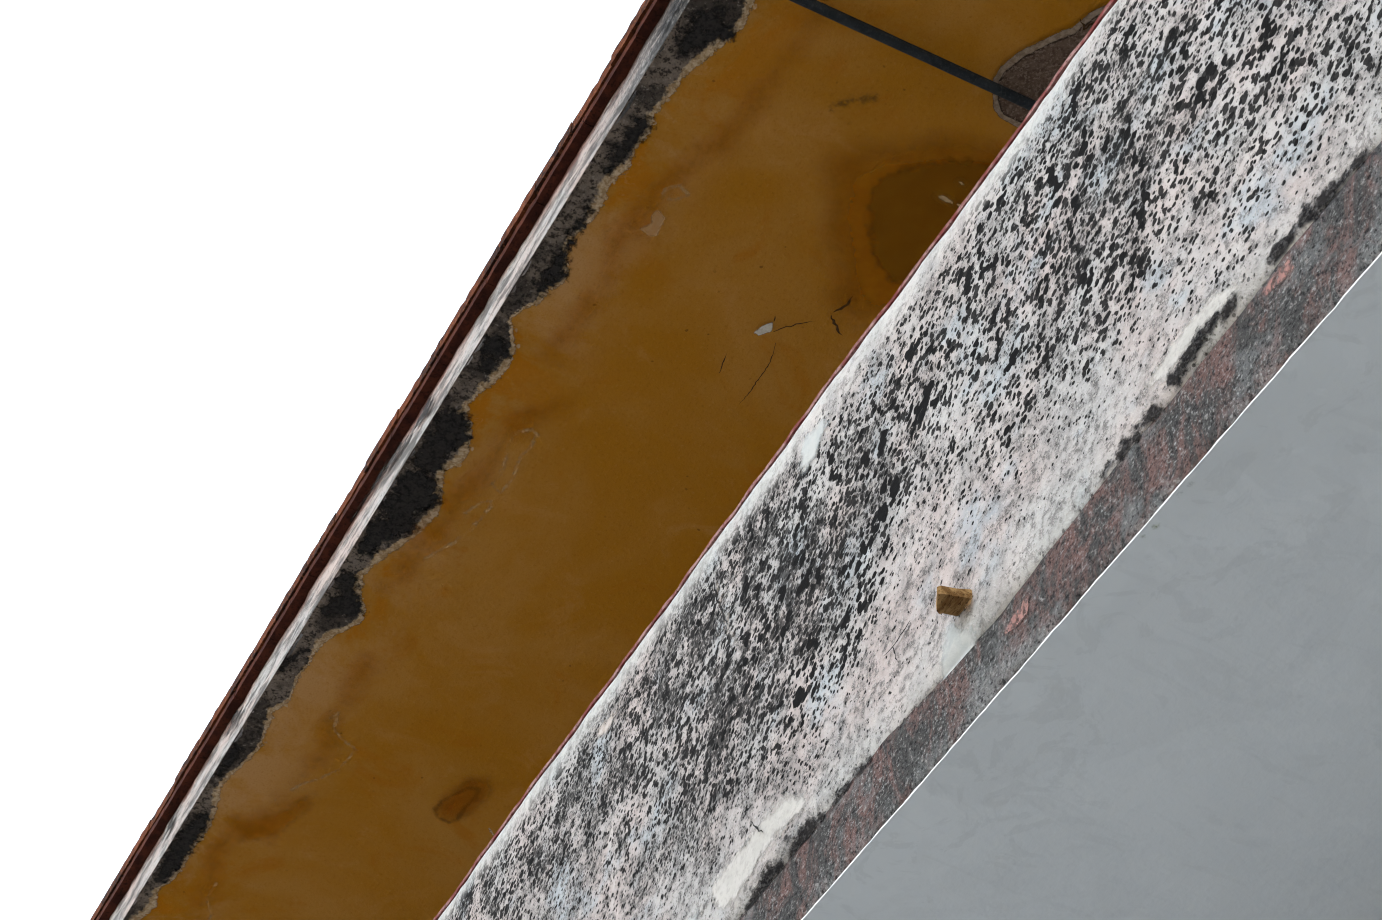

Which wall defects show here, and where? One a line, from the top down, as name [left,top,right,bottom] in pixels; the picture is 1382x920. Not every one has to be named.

water stain [657,0,736,58]
flaking render [993,5,1106,127]
water stain [532,206,595,298]
water stain [834,146,999,313]
water stain [1267,139,1371,265]
water stain [351,394,473,556]
peeling [123,0,757,920]
peeling [801,418,827,469]
water stain [1099,291,1236,479]
water stain [319,569,364,618]
peeling [711,793,806,910]
water stain [744,754,872,915]